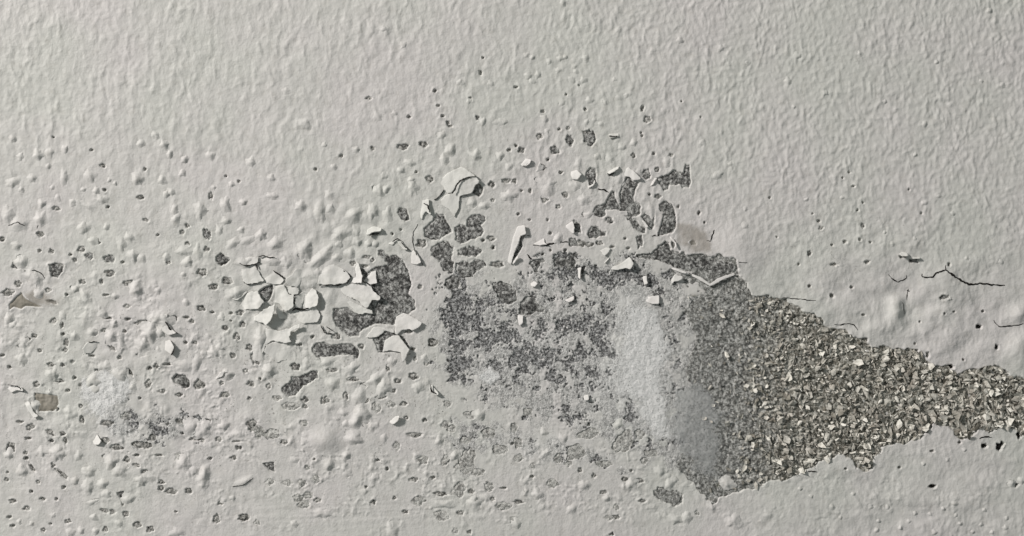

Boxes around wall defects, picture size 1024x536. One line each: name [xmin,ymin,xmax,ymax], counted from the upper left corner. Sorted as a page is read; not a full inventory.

peeling [2,239,124,309]
peeling [7,317,122,500]
peeling [197,153,1024,521]
crack [888,265,1005,310]